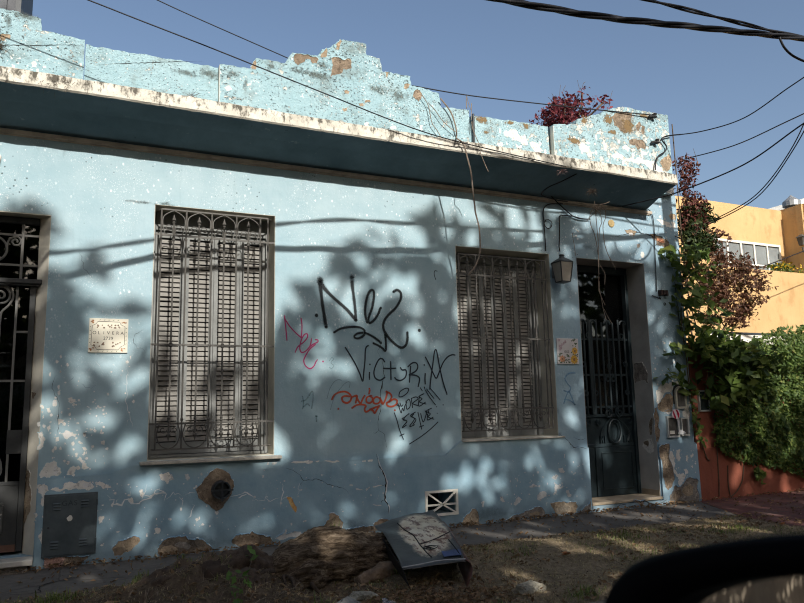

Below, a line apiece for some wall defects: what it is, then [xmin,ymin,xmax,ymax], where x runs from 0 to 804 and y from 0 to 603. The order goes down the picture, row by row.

flaking render [293,39,352,76]
flaking render [404,83,422,102]
peeling [497,129,547,154]
peeling [573,111,672,172]
crack [230,345,405,514]
flaking render [634,340,700,504]
flaking render [23,382,213,556]
peeling [500,454,592,522]
flaking render [231,520,306,547]